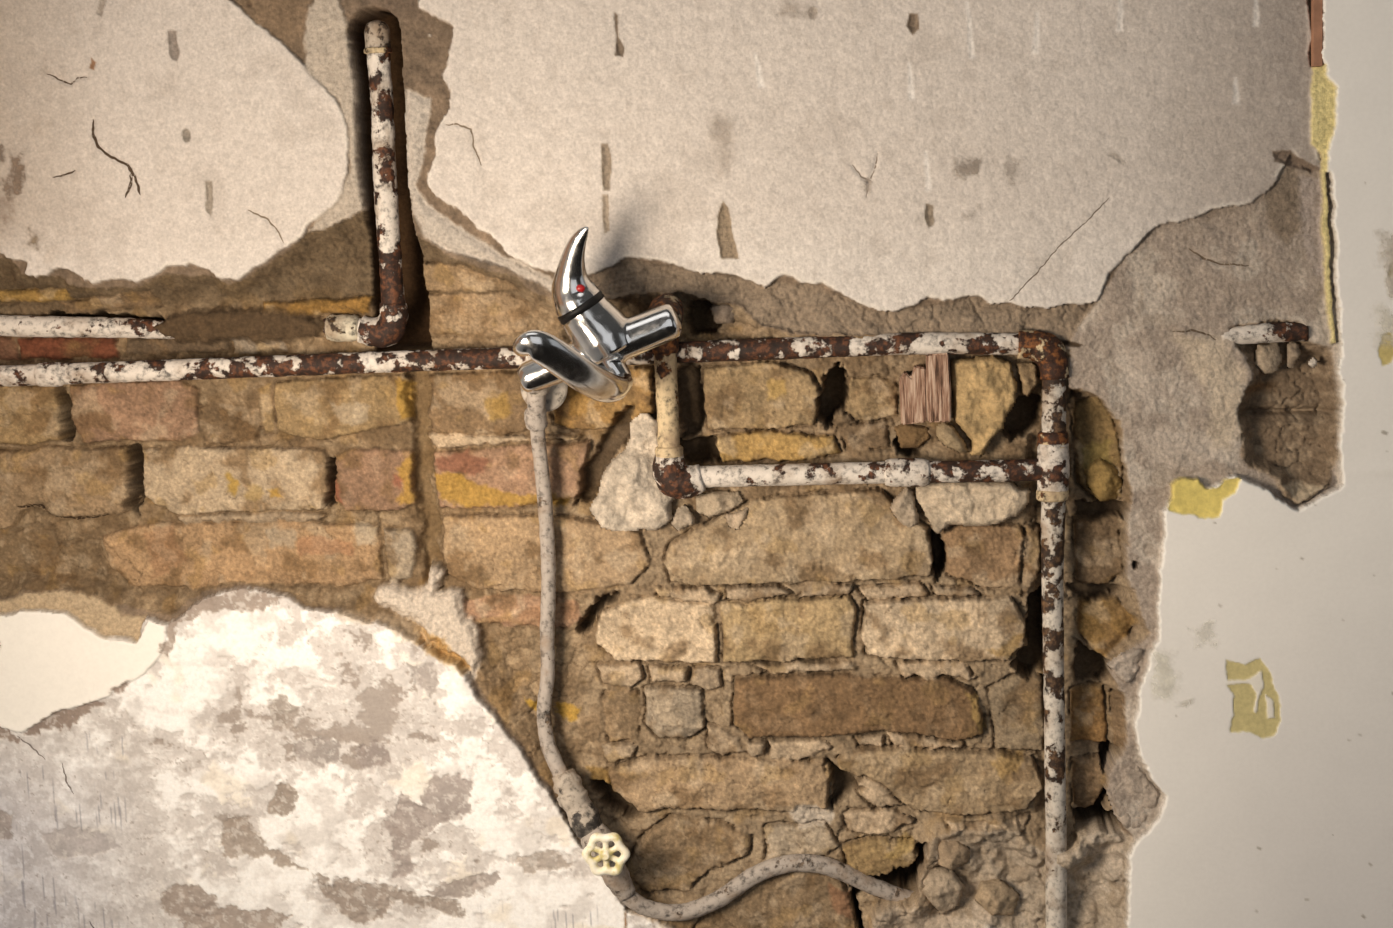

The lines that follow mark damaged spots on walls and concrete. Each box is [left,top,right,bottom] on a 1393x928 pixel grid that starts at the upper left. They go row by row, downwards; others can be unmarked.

crack [47,74,87,85]
crack [53,119,141,198]
flaking render [0,0,571,365]
flaking render [340,0,1345,853]
flaking render [0,364,1046,928]